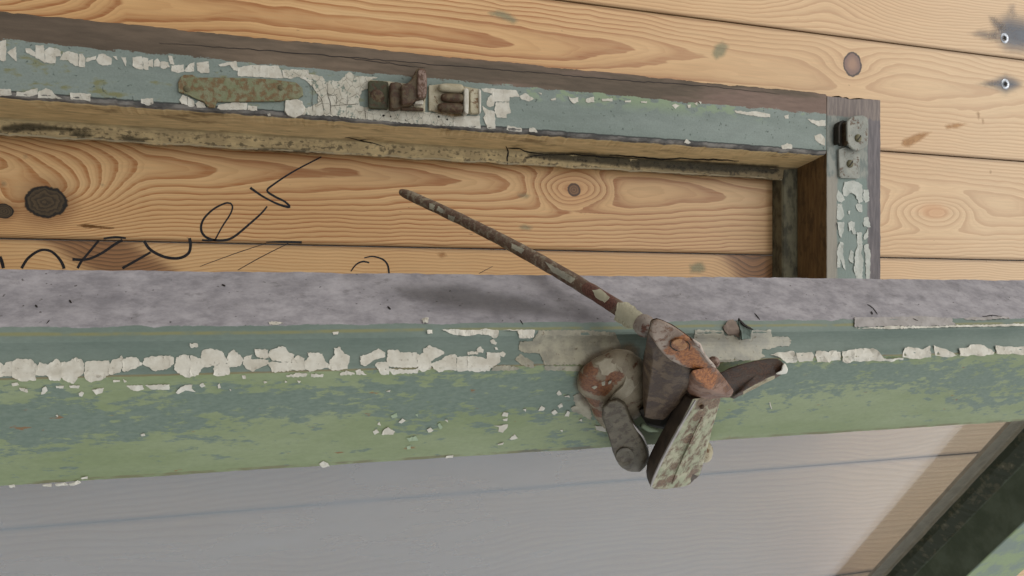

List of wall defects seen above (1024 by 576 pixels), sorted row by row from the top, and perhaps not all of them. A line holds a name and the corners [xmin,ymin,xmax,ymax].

peeling [0,40,556,132]
peeling [808,119,826,146]
crack [506,147,544,165]
crack [571,153,737,162]
peeling [836,180,871,279]
peeling [0,289,642,400]
peeling [694,329,1024,363]
peeling [373,413,418,435]
peeling [497,412,518,445]